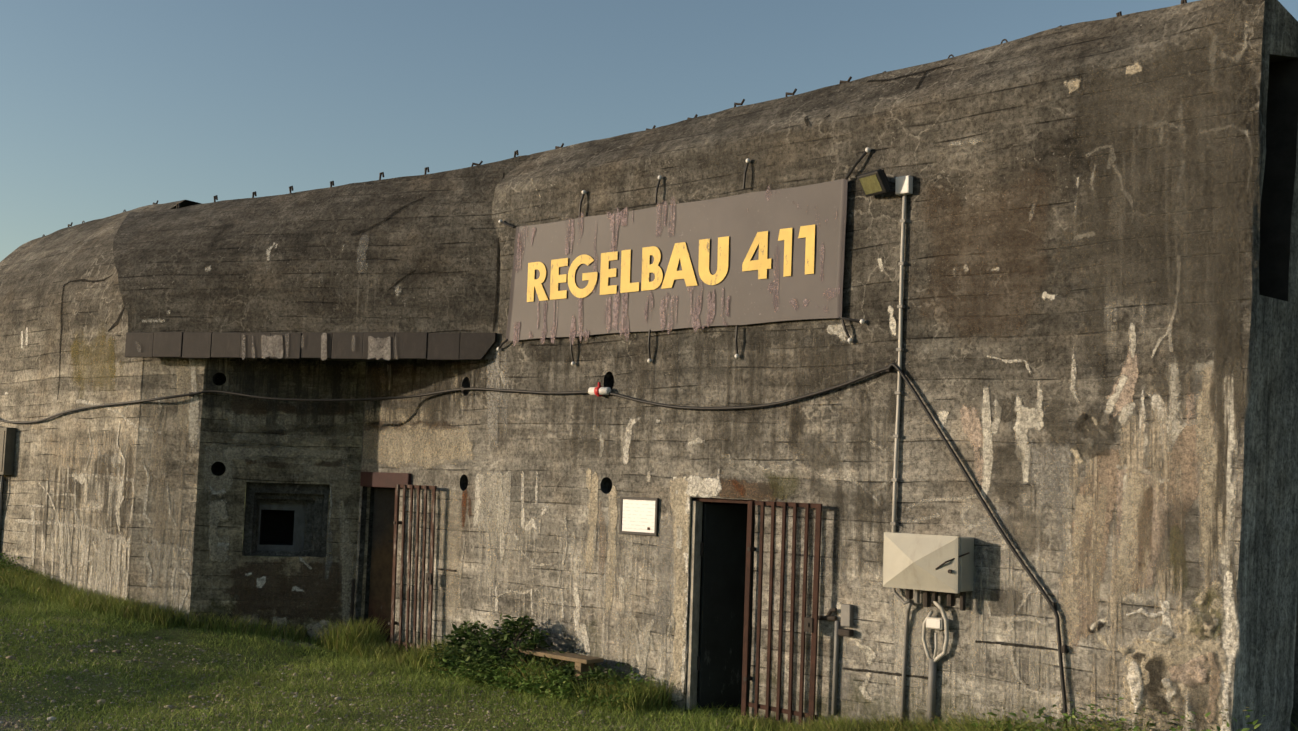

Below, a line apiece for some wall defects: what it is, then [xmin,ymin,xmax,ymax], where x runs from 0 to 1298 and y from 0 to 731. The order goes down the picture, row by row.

damp [938,13,1260,731]
damp [31,349,508,628]
corrosion [462,489,471,527]
damp [473,471,548,628]
spalling [1089,600,1227,731]